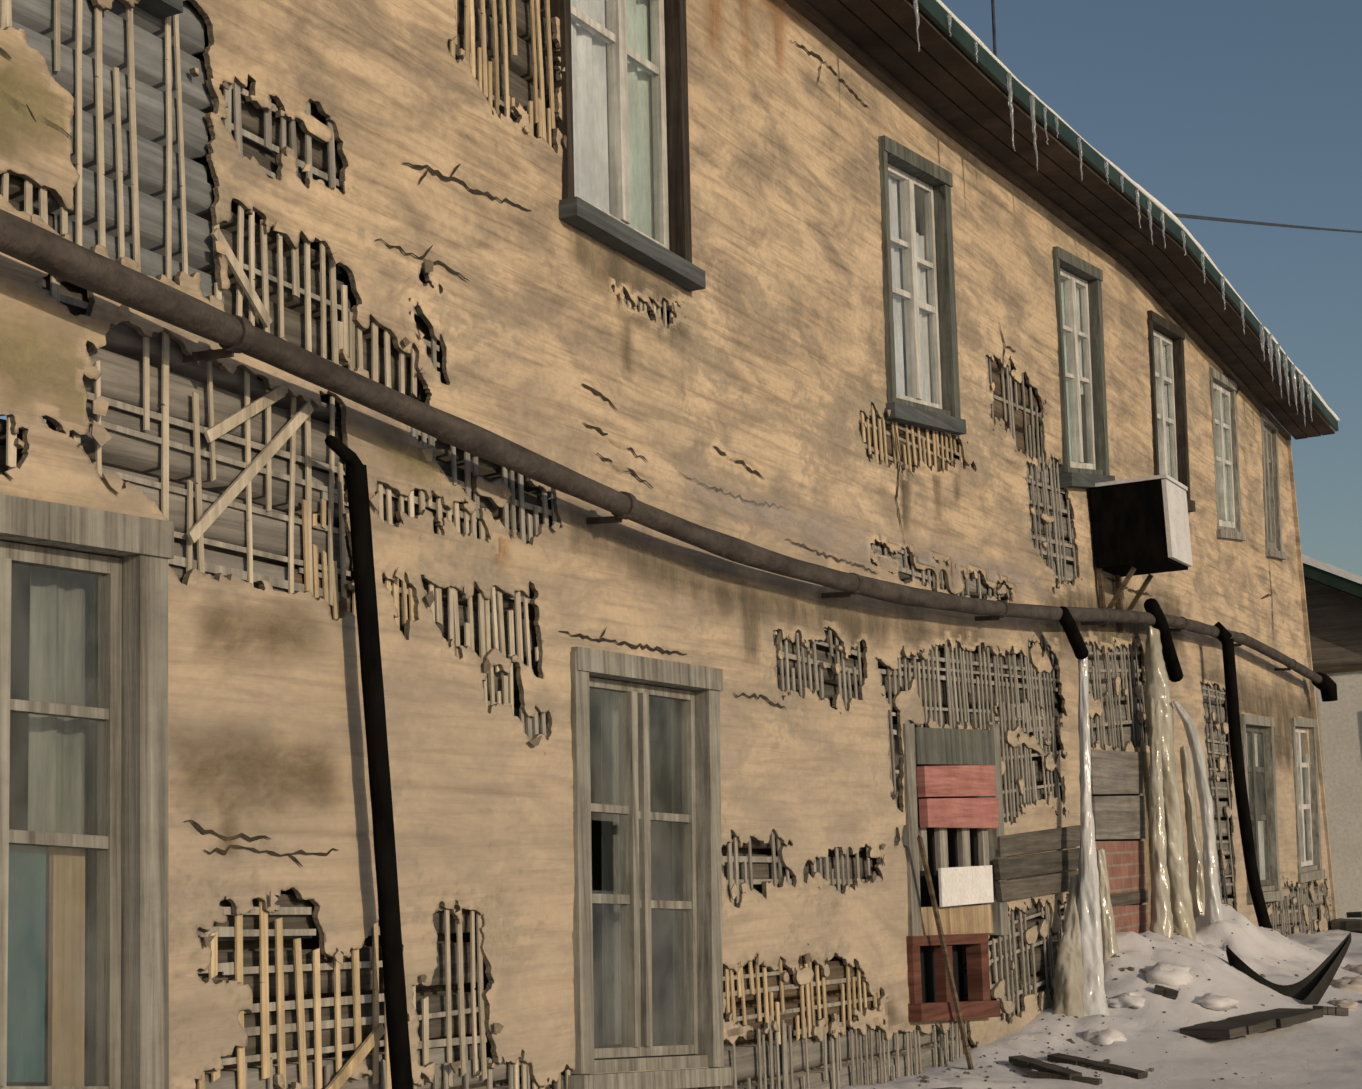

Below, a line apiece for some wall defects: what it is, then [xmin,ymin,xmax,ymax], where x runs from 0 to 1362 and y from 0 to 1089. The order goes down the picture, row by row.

flaking render [447,0,567,148]
crack [790,40,871,110]
flaking render [0,0,446,403]
crack [402,163,532,211]
flaking render [46,305,357,620]
flaking render [985,356,1077,589]
flaking render [382,567,546,747]
crack [559,627,687,655]
flaking render [773,628,1069,822]
crack [184,820,338,867]
flaking render [195,891,392,1089]
flaking render [412,903,571,1089]